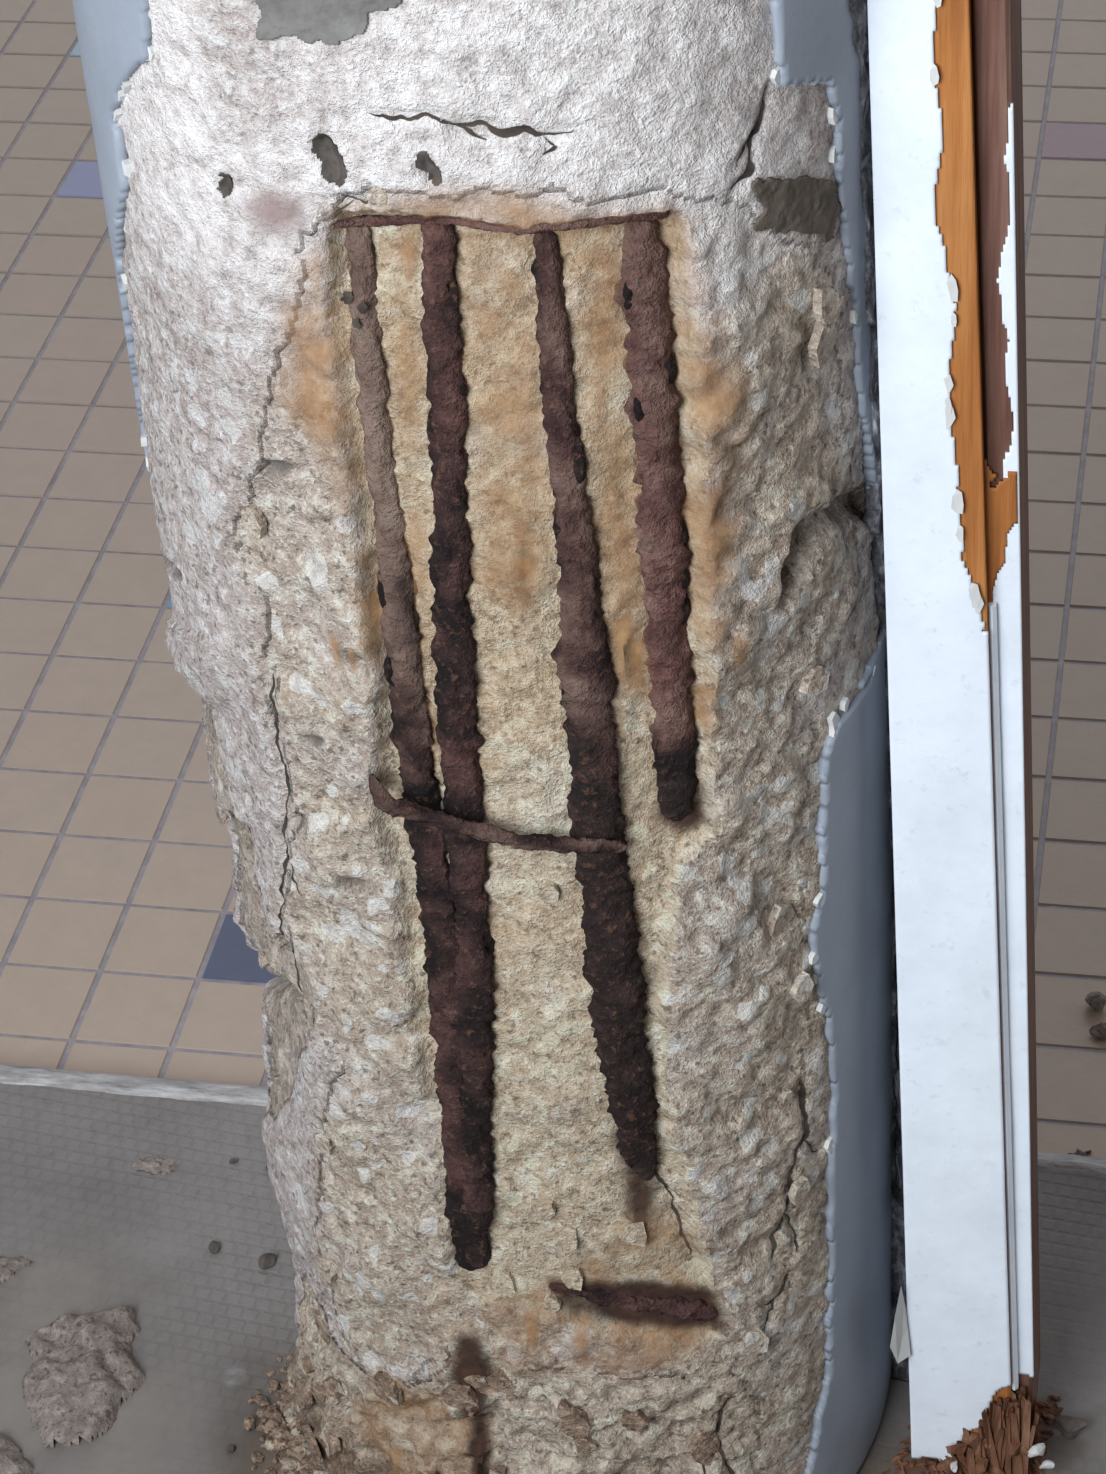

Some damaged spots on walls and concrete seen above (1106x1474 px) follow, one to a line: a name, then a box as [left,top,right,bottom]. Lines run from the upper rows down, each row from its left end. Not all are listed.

crack [368,112,574,155]
corrosion [616,618,640,671]
spalling [202,0,911,1474]
crack [269,673,302,992]
corrosion [659,793,703,828]
corrosion [615,1135,652,1223]
crack [655,1171,692,1255]
crack [764,1080,817,1330]
corrosion [554,1282,722,1362]